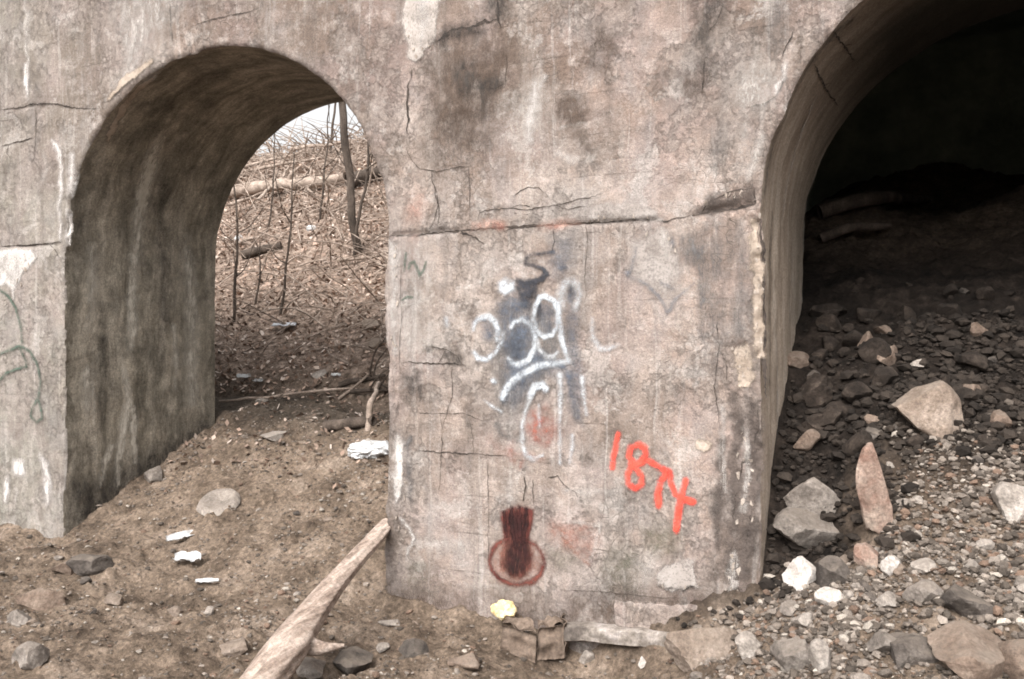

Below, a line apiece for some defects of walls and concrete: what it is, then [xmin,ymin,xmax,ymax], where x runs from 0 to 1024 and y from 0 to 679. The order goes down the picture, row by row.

crack [0,103,96,158]
peeling [402,0,440,61]
damp [430,21,507,135]
damp [556,96,587,138]
crack [393,72,767,578]
spalling [695,184,765,592]